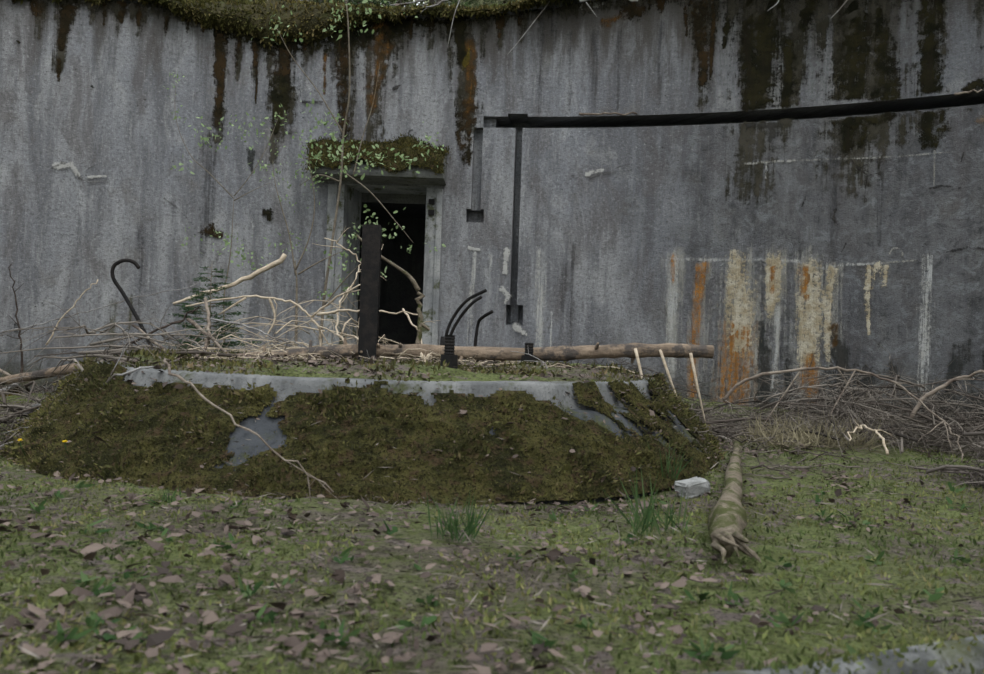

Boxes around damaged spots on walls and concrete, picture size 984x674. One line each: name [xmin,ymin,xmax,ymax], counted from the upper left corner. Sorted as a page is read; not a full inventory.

damp [246,148,255,173]
rust [661,245,843,412]
damp [812,247,984,422]